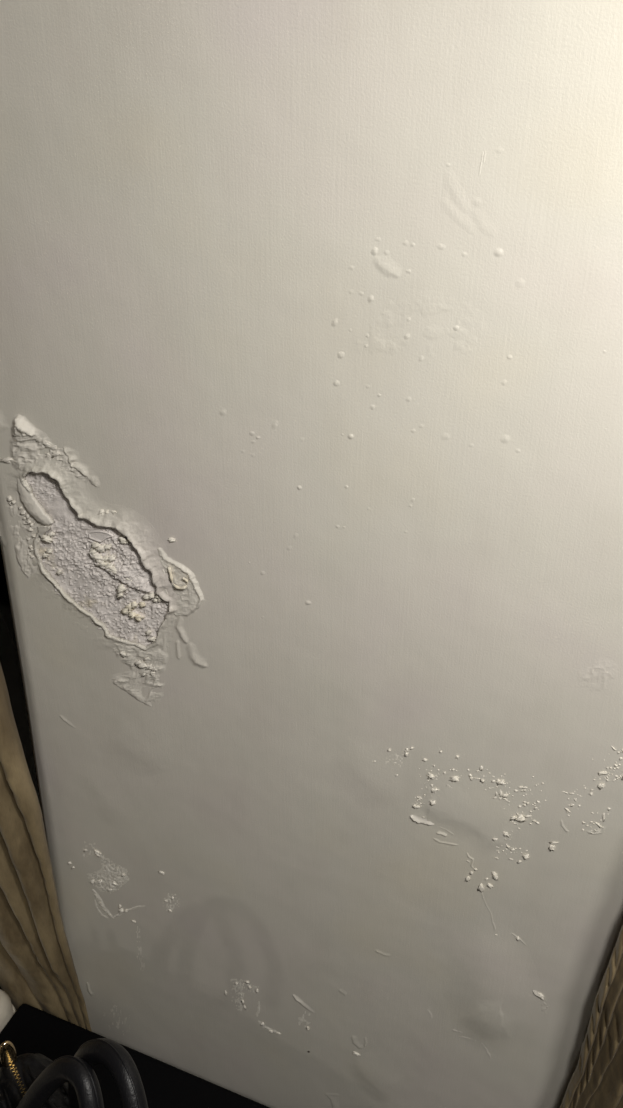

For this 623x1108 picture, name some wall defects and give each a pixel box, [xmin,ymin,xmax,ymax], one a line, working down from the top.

spalling [0,450,205,710]